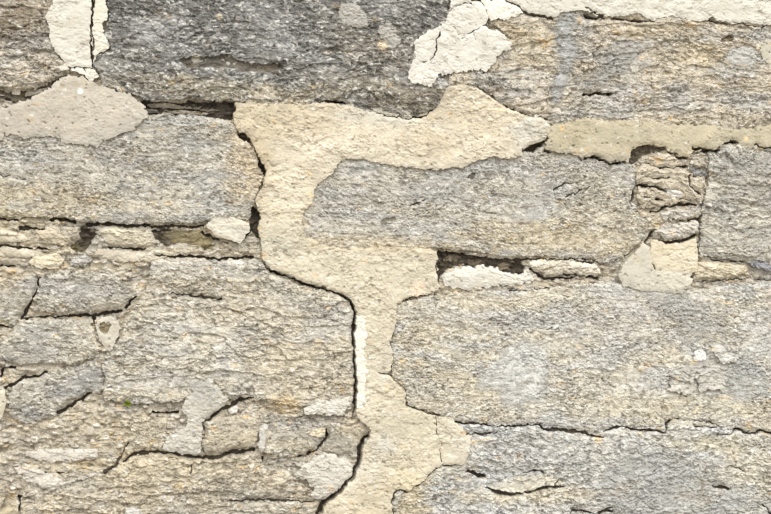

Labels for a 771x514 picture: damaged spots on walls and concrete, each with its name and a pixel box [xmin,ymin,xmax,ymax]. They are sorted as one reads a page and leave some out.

peeling [408,0,771,88]
crack [263,263,356,412]
crack [378,372,771,438]
crack [103,442,255,474]
crack [229,435,368,514]
crack [390,458,561,514]
crack [571,506,612,514]